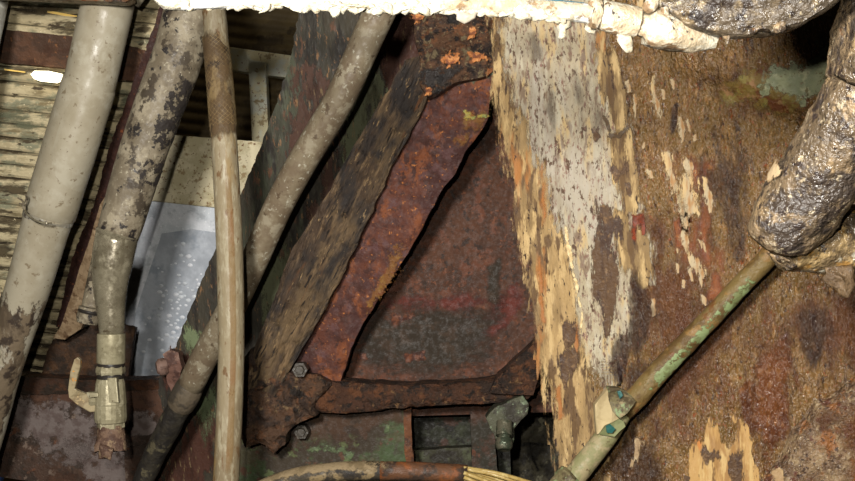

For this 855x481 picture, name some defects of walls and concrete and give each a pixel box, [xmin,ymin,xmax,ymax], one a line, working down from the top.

corrosion [283,58,330,158]
corrosion [304,148,340,224]
corrosion [367,244,406,314]
peeling [486,17,715,470]
peeling [647,278,755,390]
corrosion [255,406,414,462]
peeling [587,452,611,481]
spalling [686,413,785,481]